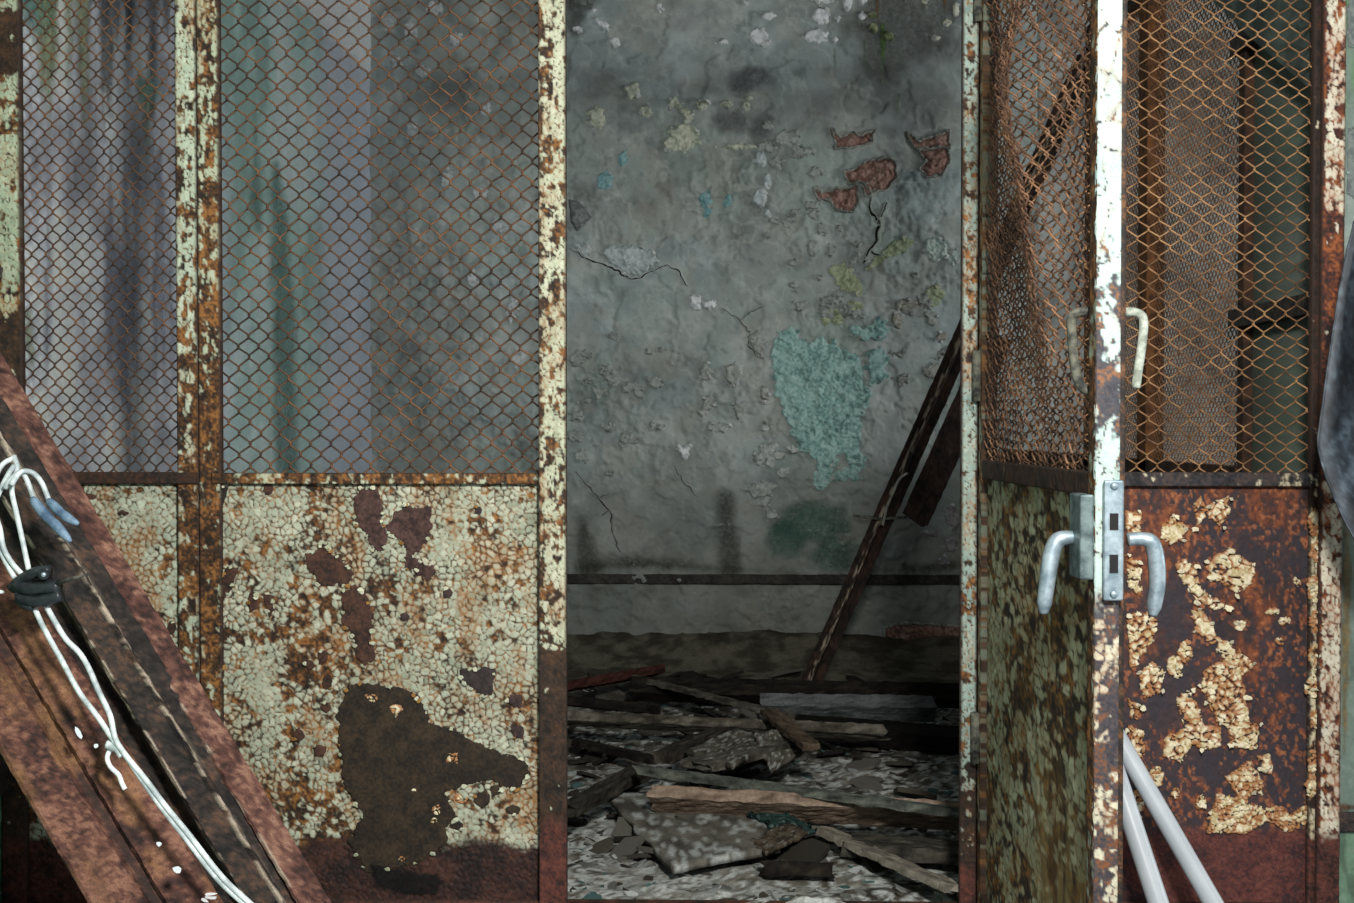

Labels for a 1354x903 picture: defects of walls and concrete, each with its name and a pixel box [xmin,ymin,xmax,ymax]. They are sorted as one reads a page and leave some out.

peeling [741,0,777,48]
peeling [801,0,867,44]
peeling [624,82,952,388]
crack [862,197,888,264]
crack [569,247,689,286]
crack [723,306,765,358]
corrosion [352,485,453,598]
corrosion [222,565,239,598]
corrosion [246,592,275,618]
peeling [364,694,403,716]
corrosion [291,541,531,873]
peeling [431,793,468,823]